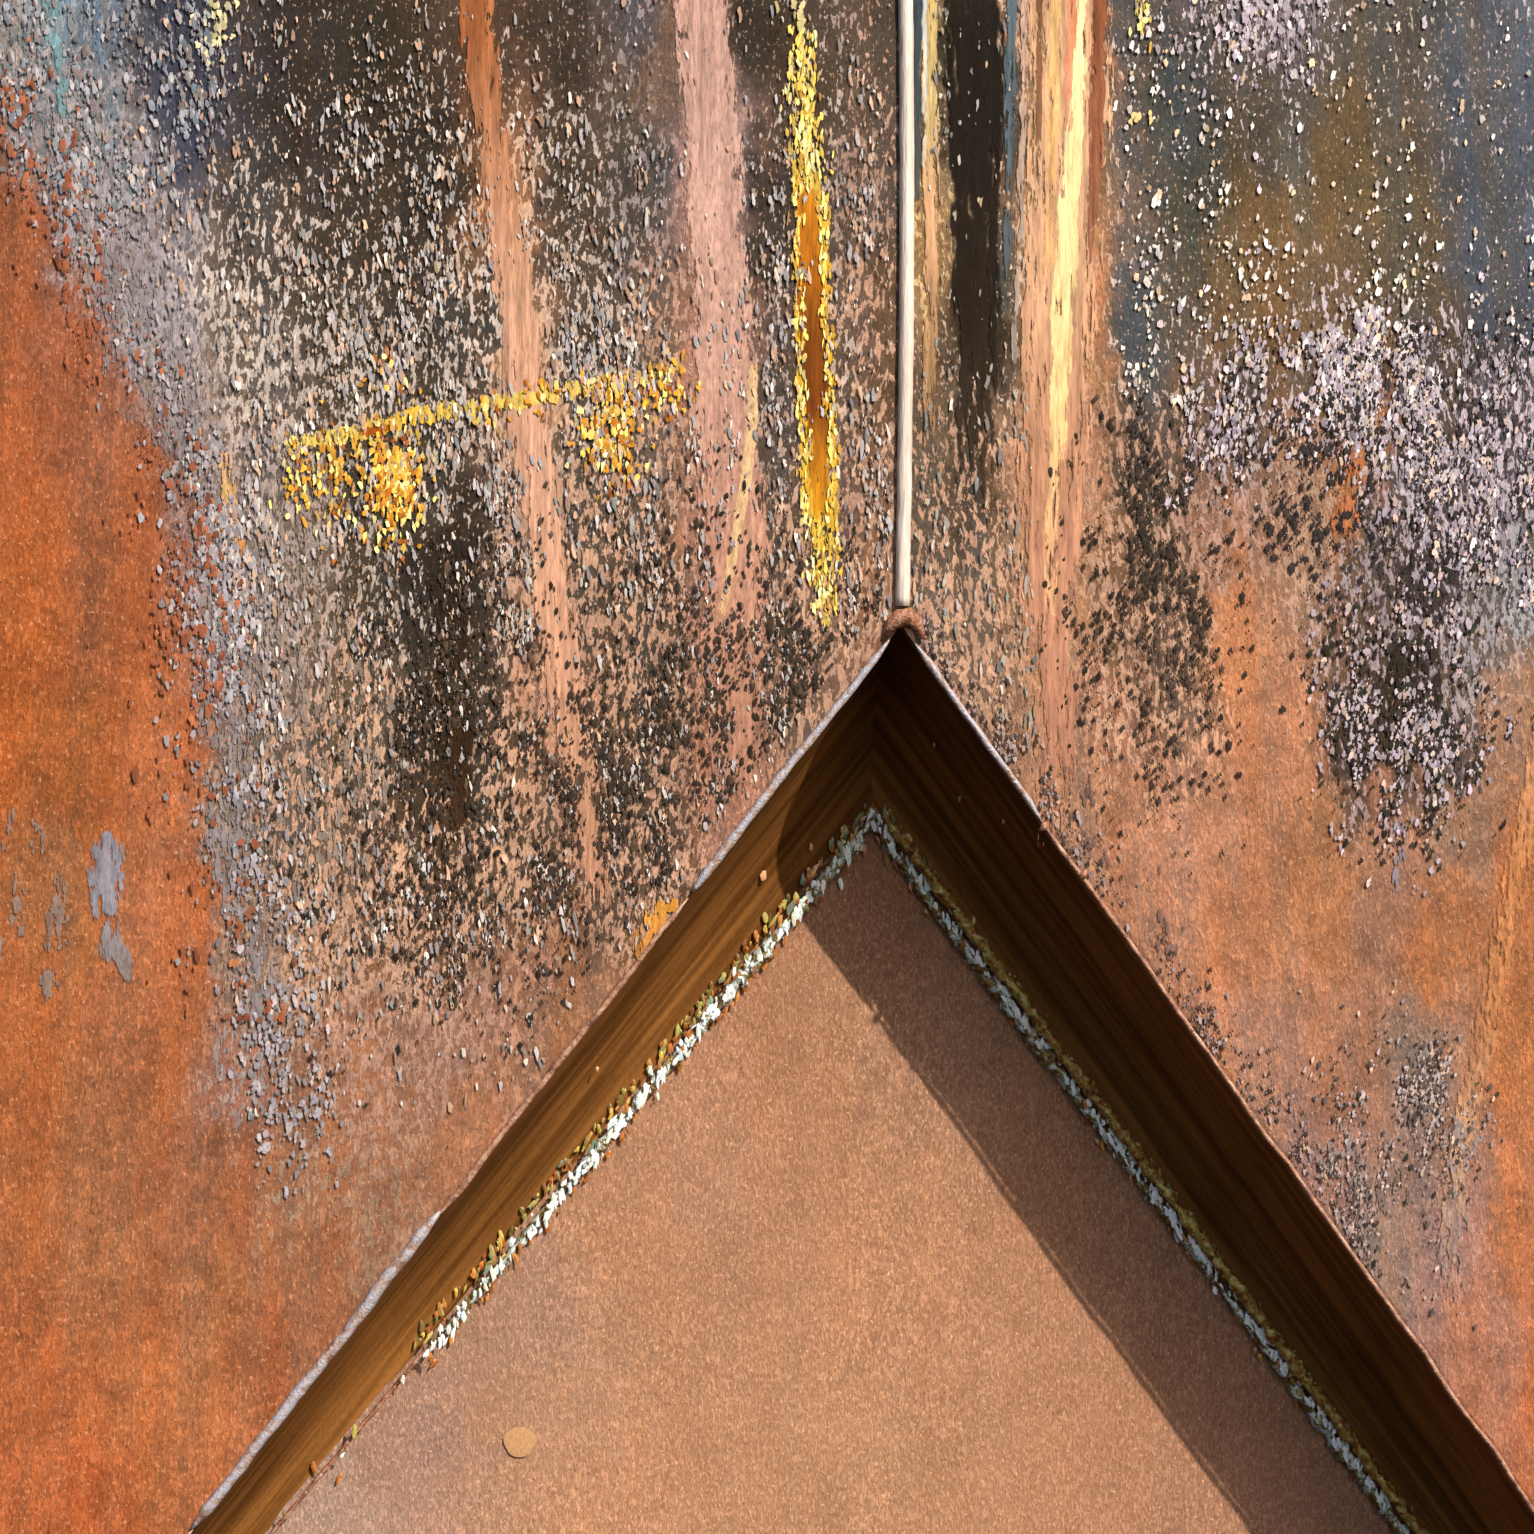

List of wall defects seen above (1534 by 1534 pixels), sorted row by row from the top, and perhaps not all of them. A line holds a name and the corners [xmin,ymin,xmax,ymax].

rust [0,36,185,387]
rust [104,393,287,1024]
peeling [0,0,893,1198]
peeling [1156,933,1509,1330]